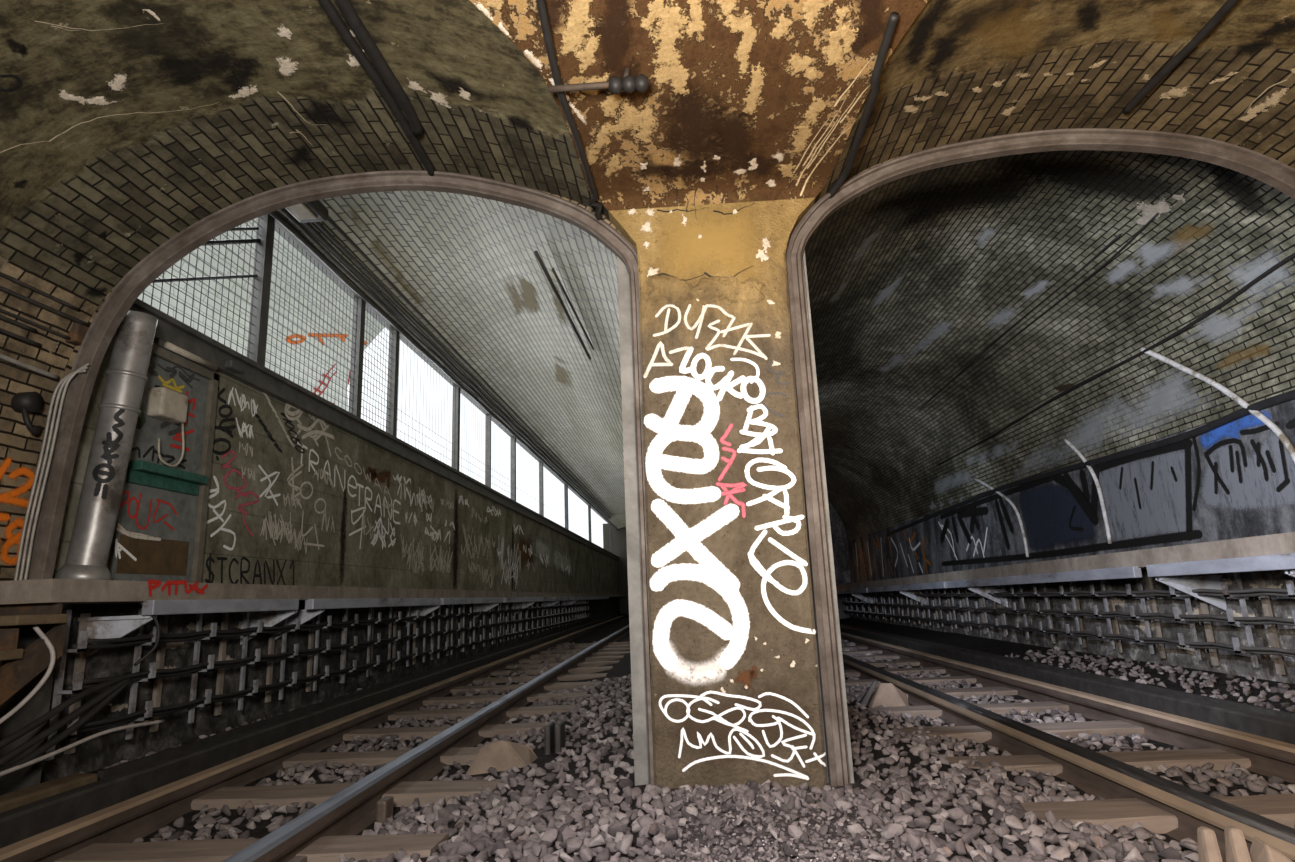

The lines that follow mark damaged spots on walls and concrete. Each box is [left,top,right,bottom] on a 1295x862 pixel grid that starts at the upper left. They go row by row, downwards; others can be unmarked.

flaking render [58,73,127,105]
flaking render [229,85,258,100]
flaking render [408,81,471,110]
flaking render [474,0,859,187]
leakage [793,0,884,196]
leakage [638,85,779,179]
peeling [627,209,687,248]
flaking render [756,237,771,262]
leakage [1024,282,1047,297]
leakage [1110,246,1178,281]
leakage [1158,279,1191,292]
leakage [1237,263,1281,292]